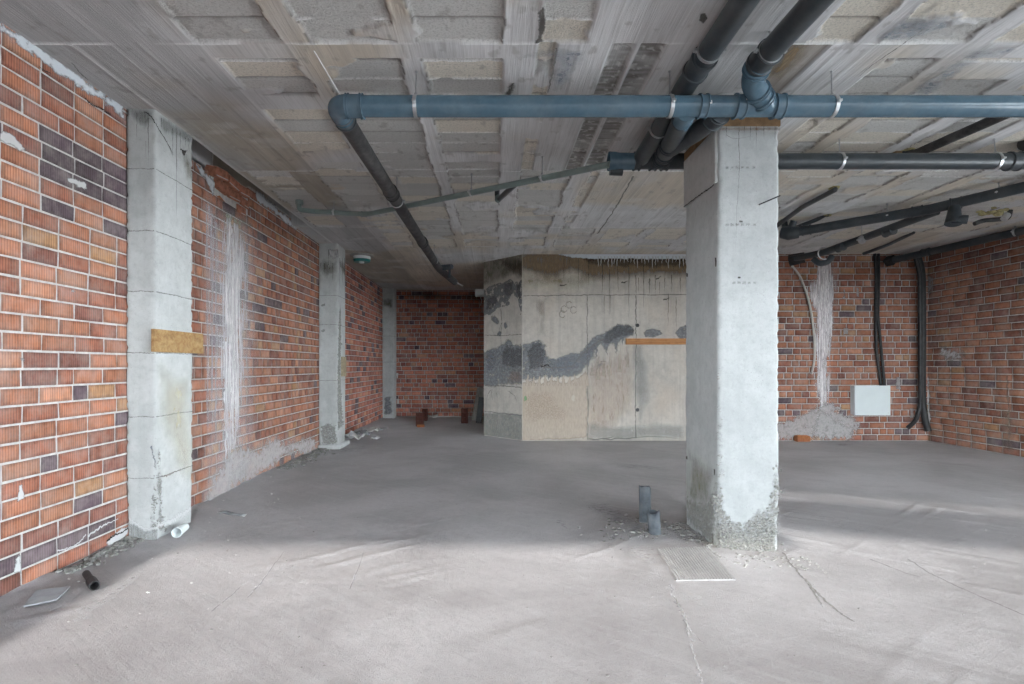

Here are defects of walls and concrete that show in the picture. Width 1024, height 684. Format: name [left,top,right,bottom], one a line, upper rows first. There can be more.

leakage [484,254,686,312]
leakage [210,215,315,500]
leakage [777,263,859,439]
spalling [150,452,167,532]
spalling [711,465,784,552]
crack [782,552,853,621]